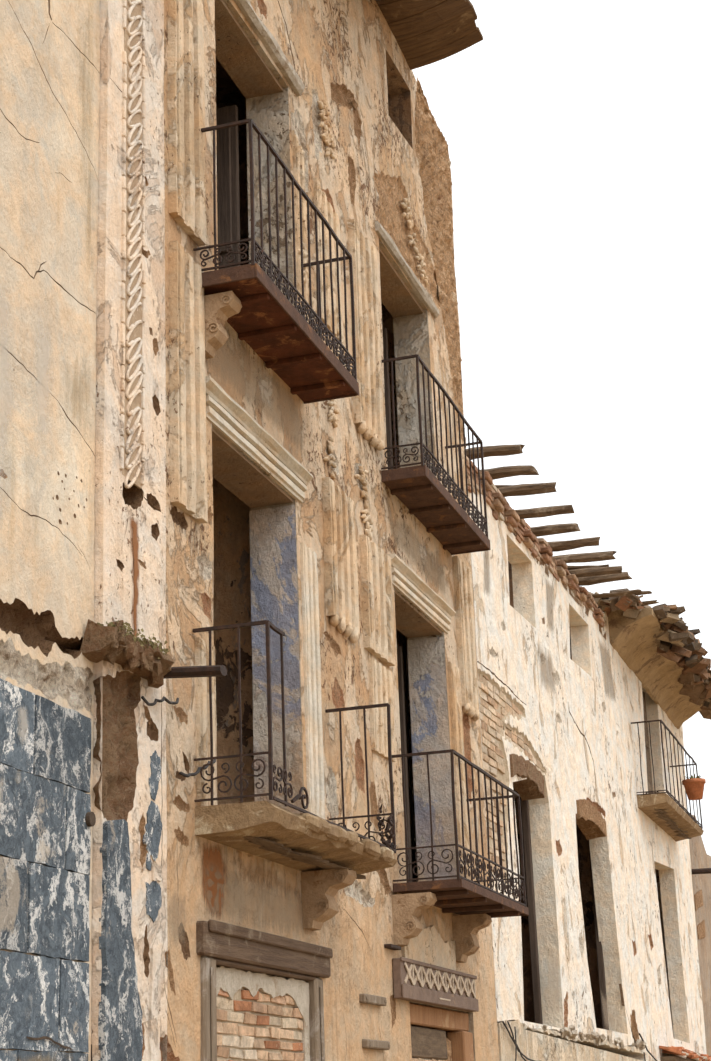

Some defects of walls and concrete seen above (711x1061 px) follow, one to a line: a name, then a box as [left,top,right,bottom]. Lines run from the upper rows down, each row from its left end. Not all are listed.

crack [10,0,122,179]
crack [0,247,95,313]
crack [0,344,95,456]
spalling [152,395,161,416]
spalling [122,481,188,541]
rust [131,519,139,637]
spalling [588,588,711,714]
spalling [93,671,162,882]
spalling [173,795,190,812]
spalling [174,826,189,848]
spalling [175,751,189,781]
flaking render [462,669,547,884]